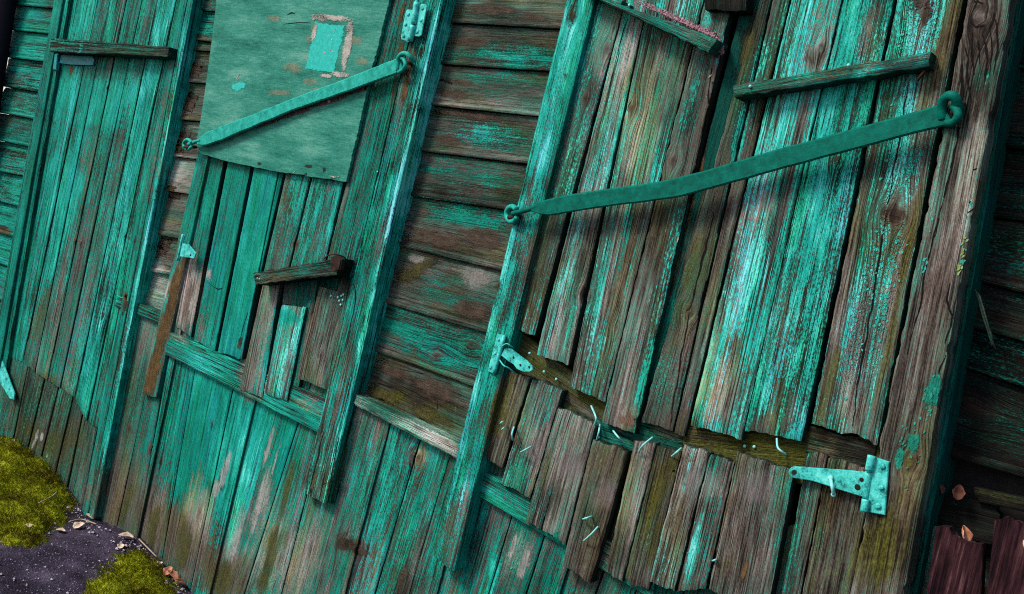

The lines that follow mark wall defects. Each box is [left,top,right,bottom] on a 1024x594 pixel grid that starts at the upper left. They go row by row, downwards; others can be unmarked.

peeling [305,14,353,78]
peeling [898,0,940,47]
spalling [669,194,694,295]
peeling [956,235,969,275]
peeling [849,242,908,383]
peeling [894,373,942,470]
peeling [198,451,231,532]
peeling [231,430,280,561]